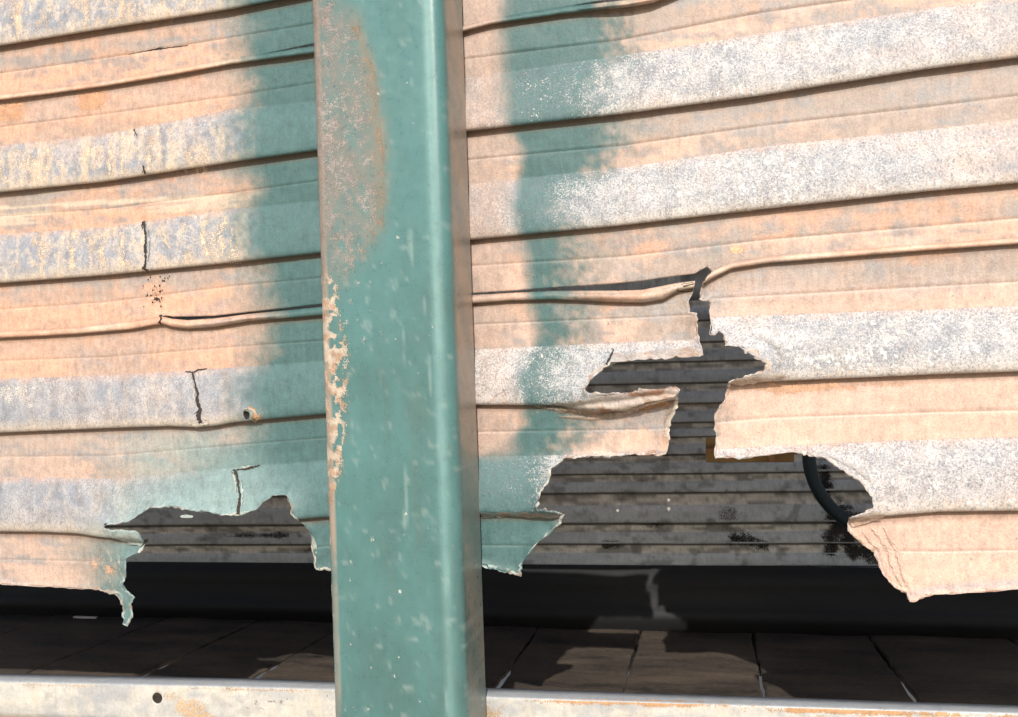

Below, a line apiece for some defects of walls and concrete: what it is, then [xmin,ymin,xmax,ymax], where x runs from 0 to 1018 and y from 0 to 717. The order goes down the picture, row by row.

corrosion [312,0,385,293]
crack [141,221,150,273]
peeling [781,313,1018,372]
crack [185,368,208,427]
peeling [321,271,359,511]
crack [232,465,260,514]
peeling [851,446,1018,506]